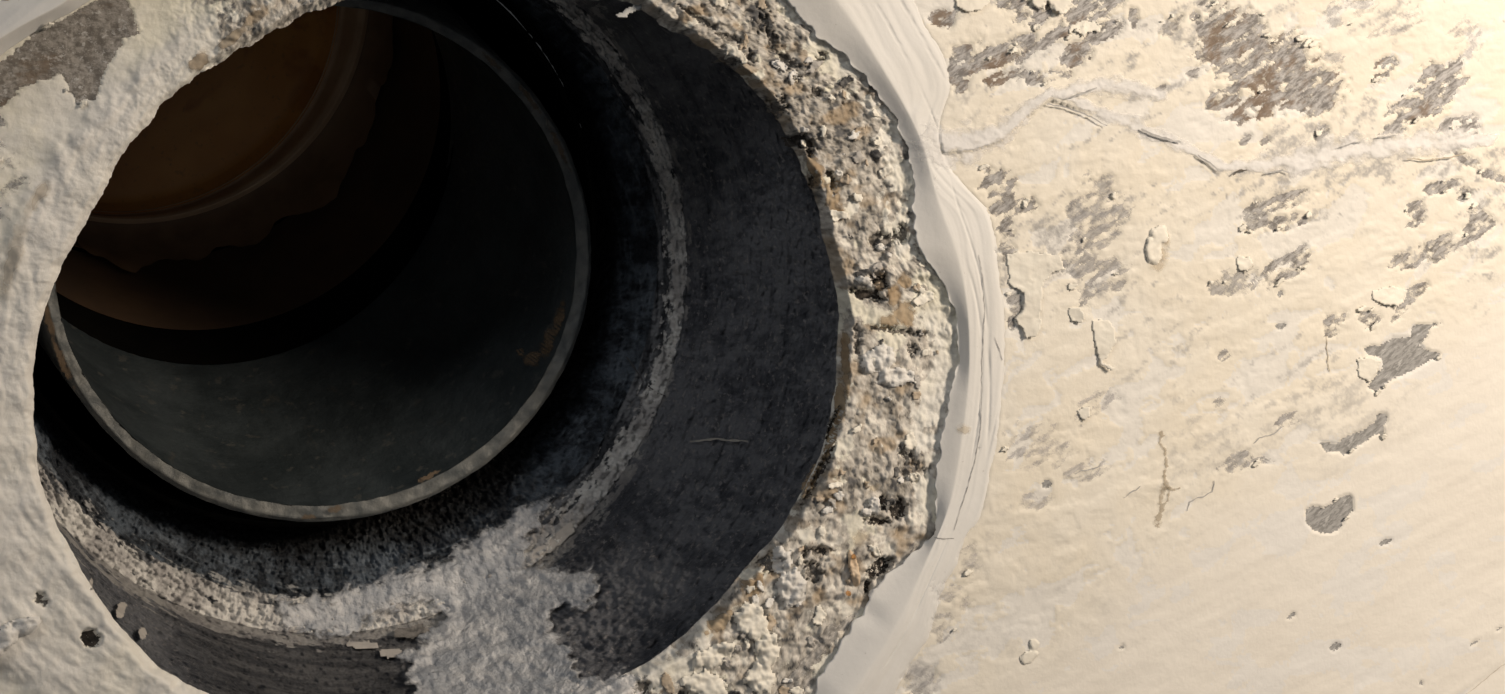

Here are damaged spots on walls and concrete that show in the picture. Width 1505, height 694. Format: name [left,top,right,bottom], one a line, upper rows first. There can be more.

peeling [0,0,139,126]
peeling [928,0,1138,93]
peeling [1160,0,1343,146]
crack [915,76,1497,175]
leakage [807,154,844,221]
leakage [880,274,915,330]
peeling [977,164,1130,339]
peeling [1239,189,1312,233]
peeling [1320,55,1503,456]
leakage [801,333,851,497]
peeling [1305,495,1353,533]
leakage [740,572,763,600]